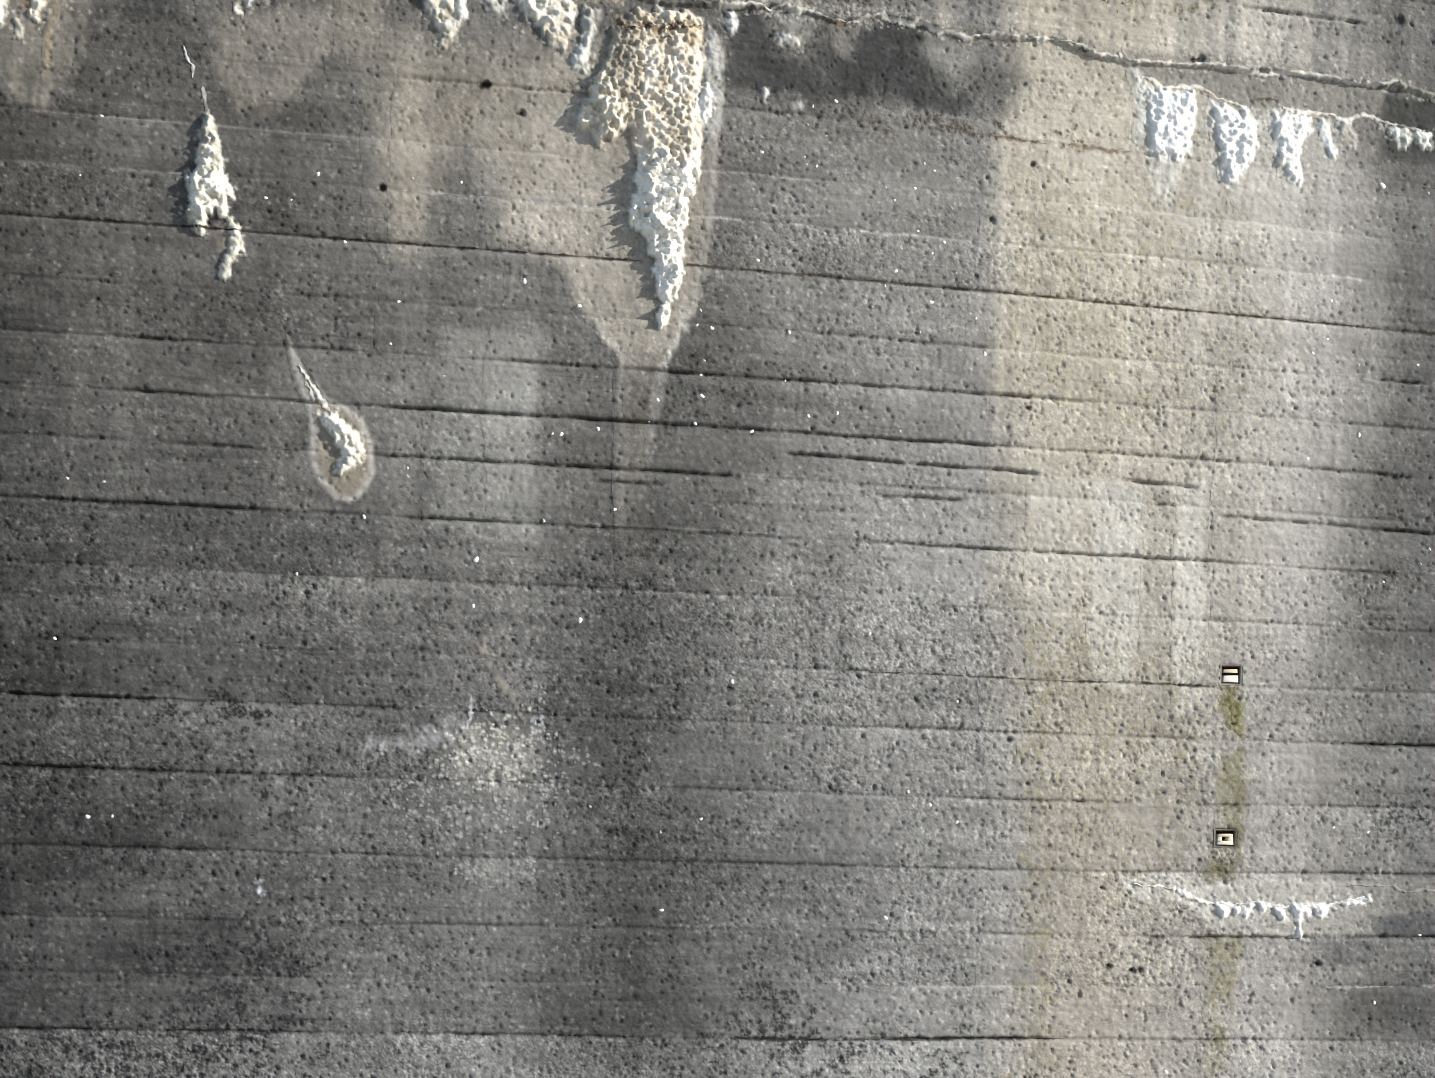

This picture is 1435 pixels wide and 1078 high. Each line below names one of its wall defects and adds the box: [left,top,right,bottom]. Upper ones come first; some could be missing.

damp [0,0,185,116]
crack [572,0,631,10]
crack [694,0,1435,132]
damp [983,0,1405,69]
damp [176,85,250,283]
damp [194,0,1035,591]
damp [962,41,1435,1078]
damp [340,634,606,890]
damp [247,877,266,904]